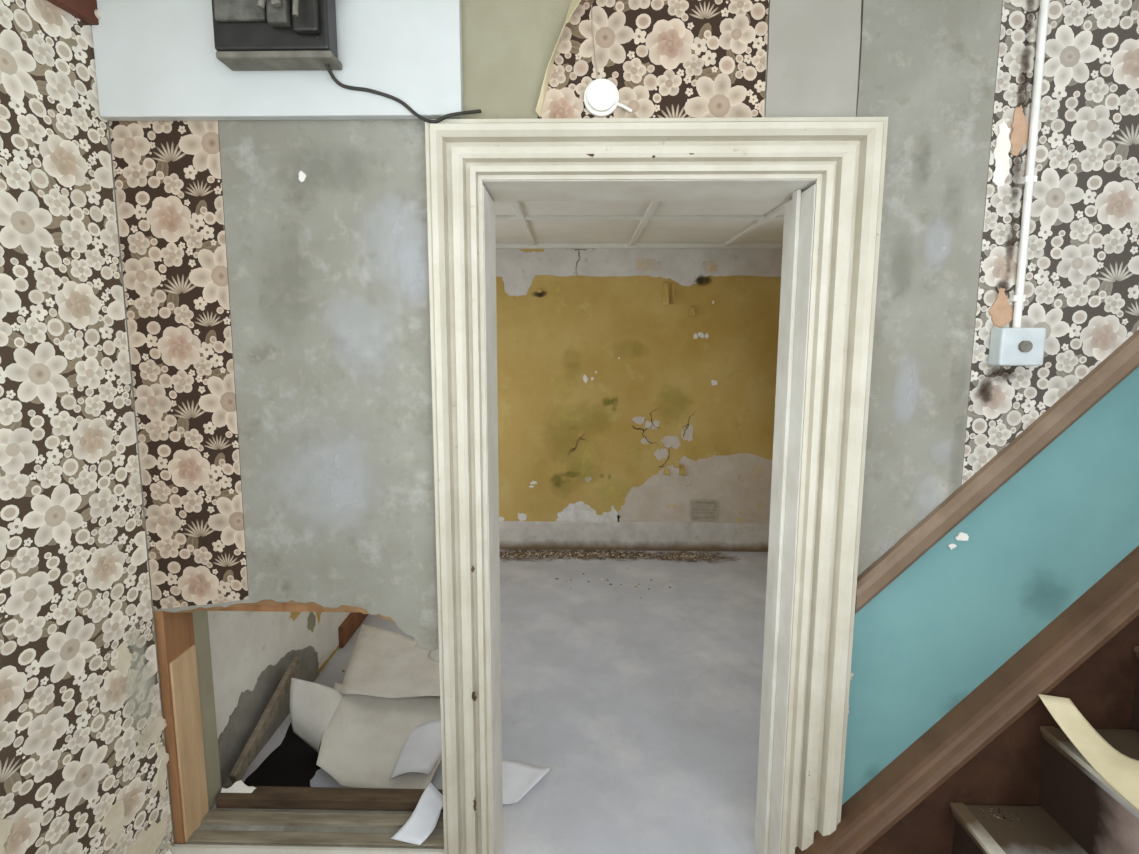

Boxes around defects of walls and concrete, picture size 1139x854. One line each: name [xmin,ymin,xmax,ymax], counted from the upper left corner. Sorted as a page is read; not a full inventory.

peeling [496,249,782,305]
peeling [556,416,772,523]
peeling [948,532,969,550]
flaking render [151,588,444,848]